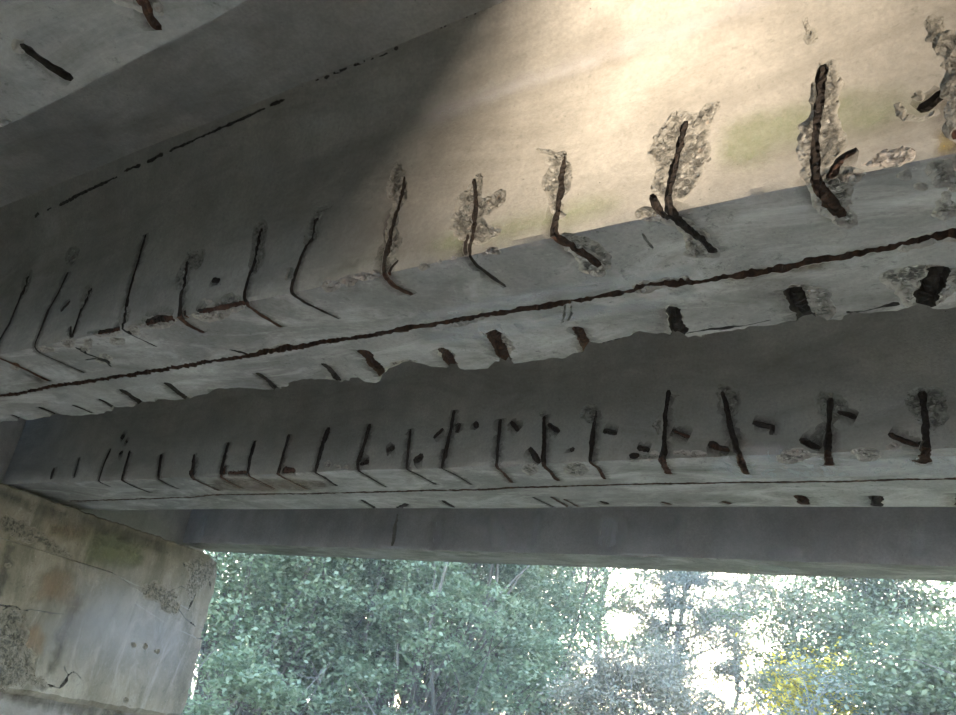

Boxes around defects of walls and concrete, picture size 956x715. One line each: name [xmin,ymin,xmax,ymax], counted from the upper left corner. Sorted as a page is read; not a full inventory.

spalling [112,0,165,31]
spalling [894,14,956,148]
spalling [796,59,956,230]
spalling [635,101,721,258]
crack [75,347,112,367]
spalling [357,350,418,377]
spalling [480,329,516,361]
crack [561,304,573,323]
spalling [568,326,590,352]
spalling [664,305,689,334]
crack [688,320,770,337]
crack [846,302,900,313]